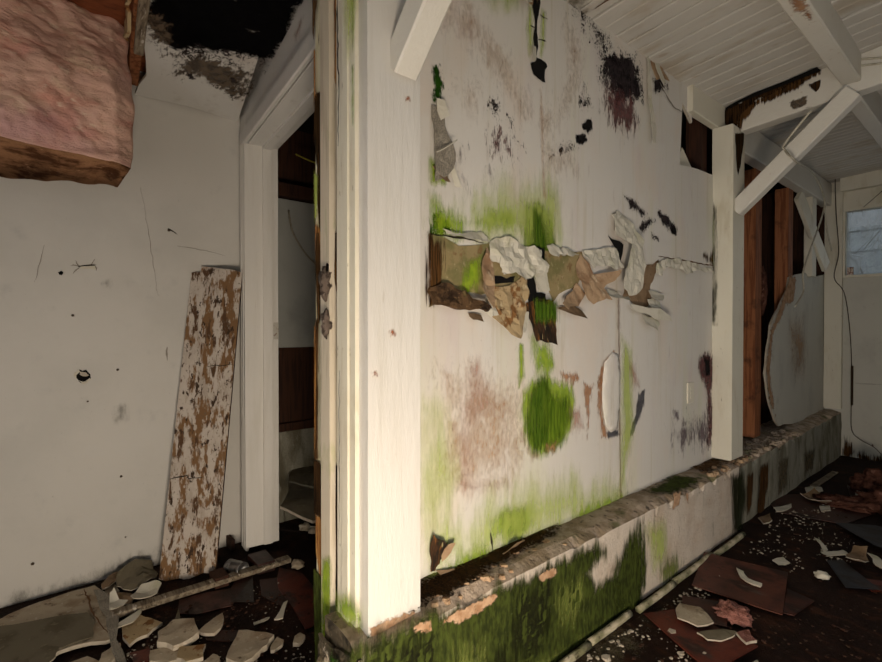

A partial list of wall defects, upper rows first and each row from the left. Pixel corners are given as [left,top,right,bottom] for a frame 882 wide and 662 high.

leakage [147,0,303,101]
leakage [569,0,645,139]
leakage [551,119,593,158]
leakage [519,298,558,452]
leakage [562,351,645,438]
spalling [367,612,432,639]
spalling [444,594,497,624]
spalling [539,568,556,582]
leakage [559,574,583,627]
leakage [613,522,646,611]